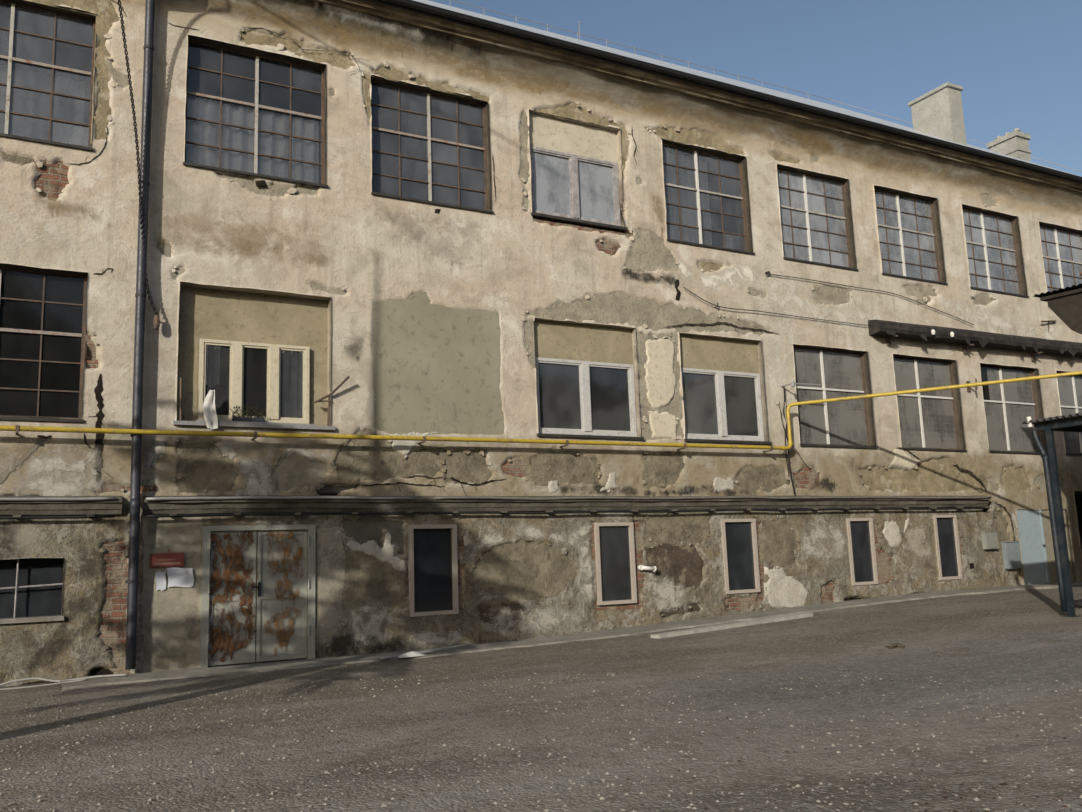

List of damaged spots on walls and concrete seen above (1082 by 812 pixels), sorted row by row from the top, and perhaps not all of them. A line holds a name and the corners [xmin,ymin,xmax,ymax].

flaking render [1,152,70,202]
flaking render [519,101,872,440]
peeling [16,448,160,496]
crack [84,374,112,485]
flaking render [145,437,273,496]
flaking render [278,429,617,495]
flaking render [642,451,685,489]
flaking render [713,465,820,492]
corrosion [208,531,303,662]
flaking render [341,515,409,595]
flaking render [725,518,861,612]